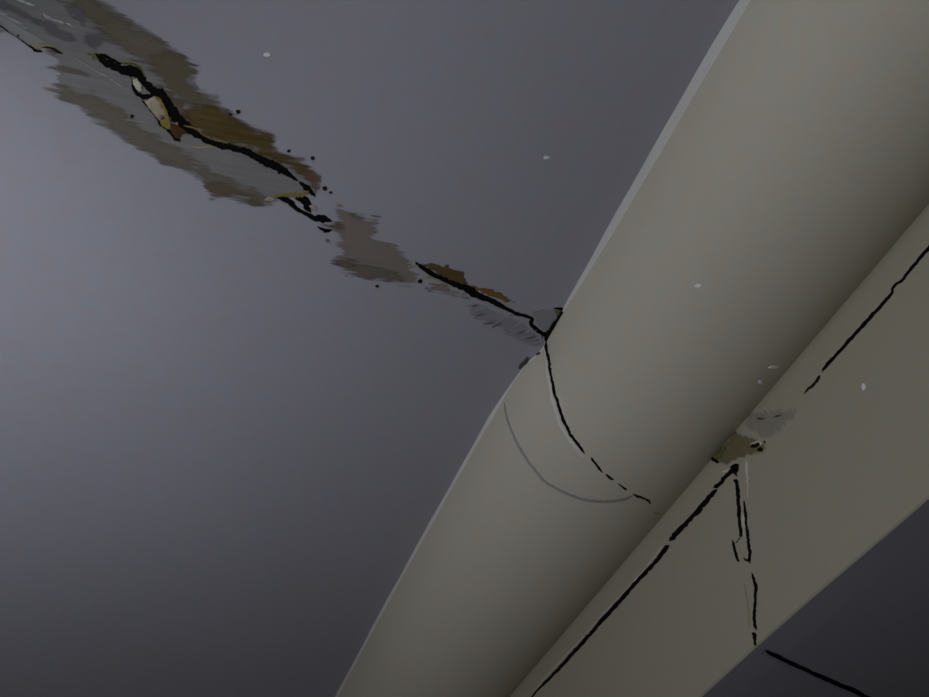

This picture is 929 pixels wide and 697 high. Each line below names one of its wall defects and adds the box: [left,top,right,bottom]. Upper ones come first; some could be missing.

leakage [0,0,332,207]
spalling [145,96,188,139]
leakage [326,210,417,288]
crack [408,261,660,514]
spalling [711,432,767,473]
crack [531,460,870,697]